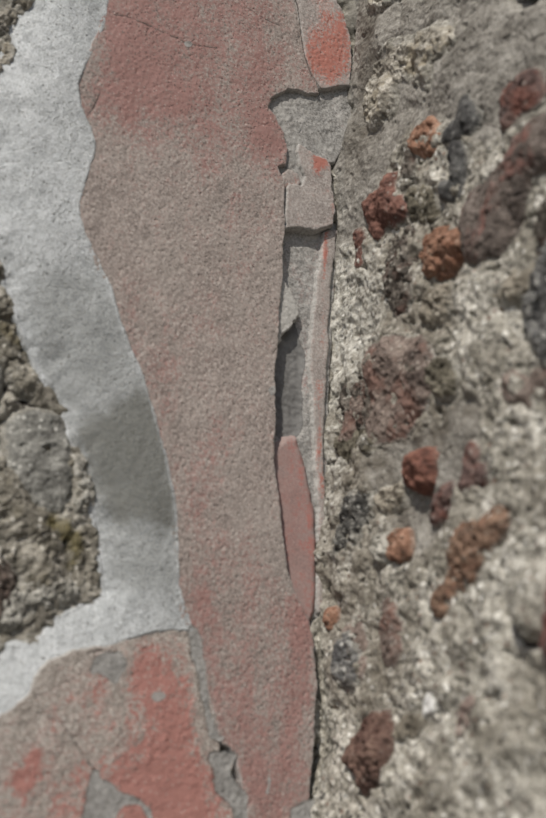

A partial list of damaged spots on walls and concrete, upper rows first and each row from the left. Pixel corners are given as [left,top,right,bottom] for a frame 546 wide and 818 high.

crack [295,0,322,90]
spalling [268,89,352,193]
spalling [274,223,337,622]
crack [188,625,224,741]
spalling [82,770,152,818]